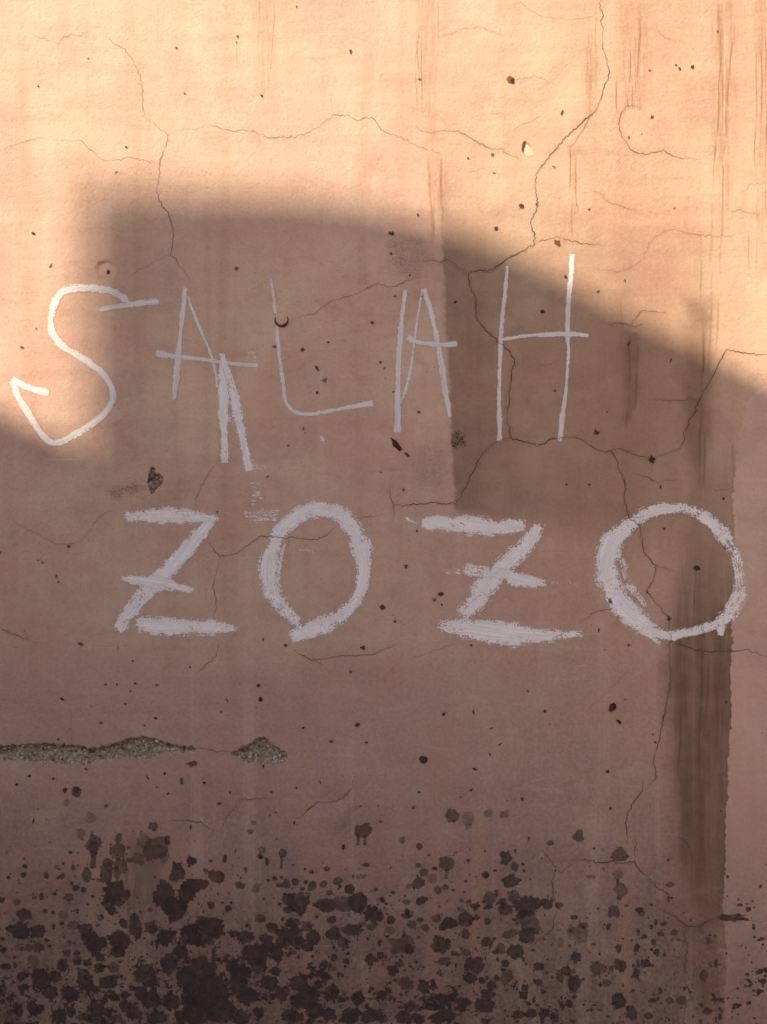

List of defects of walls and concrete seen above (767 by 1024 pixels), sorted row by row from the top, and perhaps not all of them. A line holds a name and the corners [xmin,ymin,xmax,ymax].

crack [308,52,765,656]
crack [210,535,327,614]
spalling [0,717,196,770]
spalling [231,737,288,768]
damp [675,602,732,888]